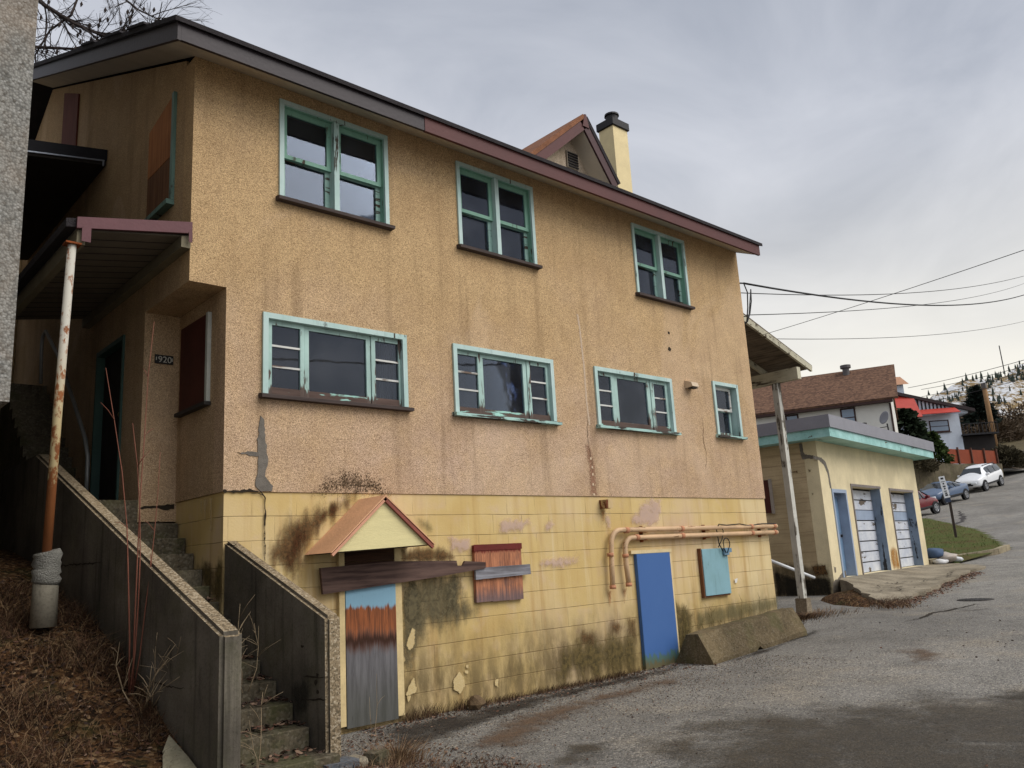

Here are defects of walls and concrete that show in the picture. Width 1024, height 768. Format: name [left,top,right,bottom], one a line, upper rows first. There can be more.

crack [223,488,266,560]
mould [272,468,391,574]
peeling [404,628,415,661]
peeling [406,678,417,702]
water stain [403,575,471,666]
peeling [453,664,469,694]